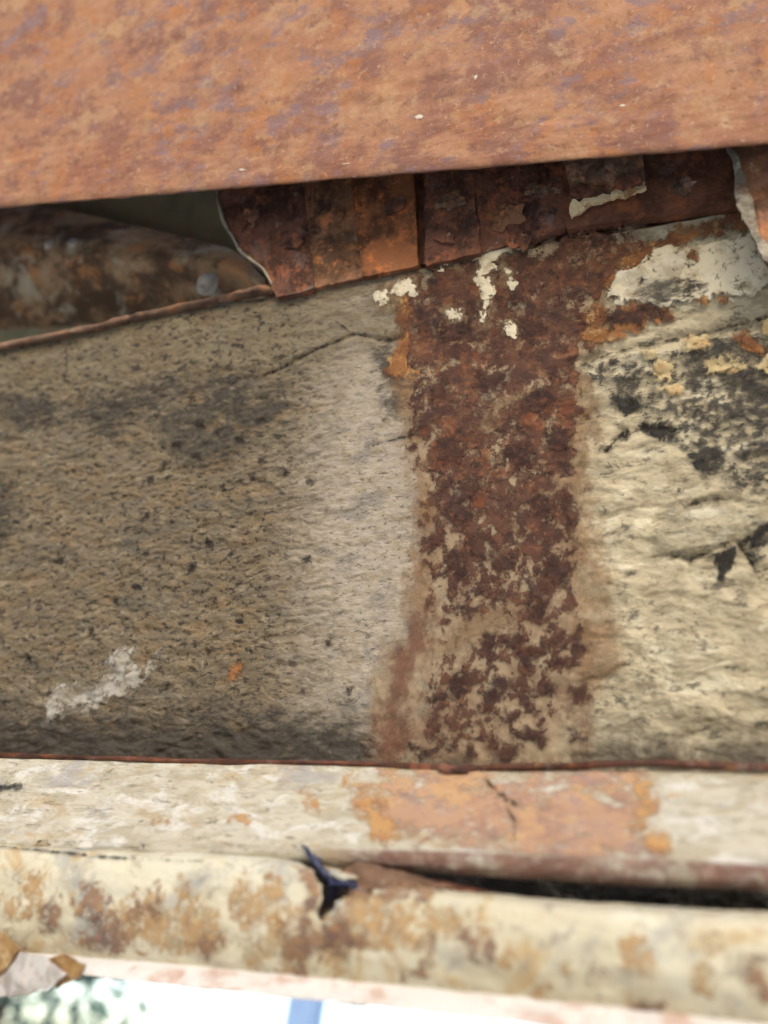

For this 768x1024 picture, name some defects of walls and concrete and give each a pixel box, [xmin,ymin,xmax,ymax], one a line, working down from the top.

rust [563,155,647,219]
peeling [607,232,768,308]
crack [264,322,397,376]
peeling [683,317,768,376]
peeling [609,349,684,442]
leakage [581,325,768,495]
rust [343,182,747,857]